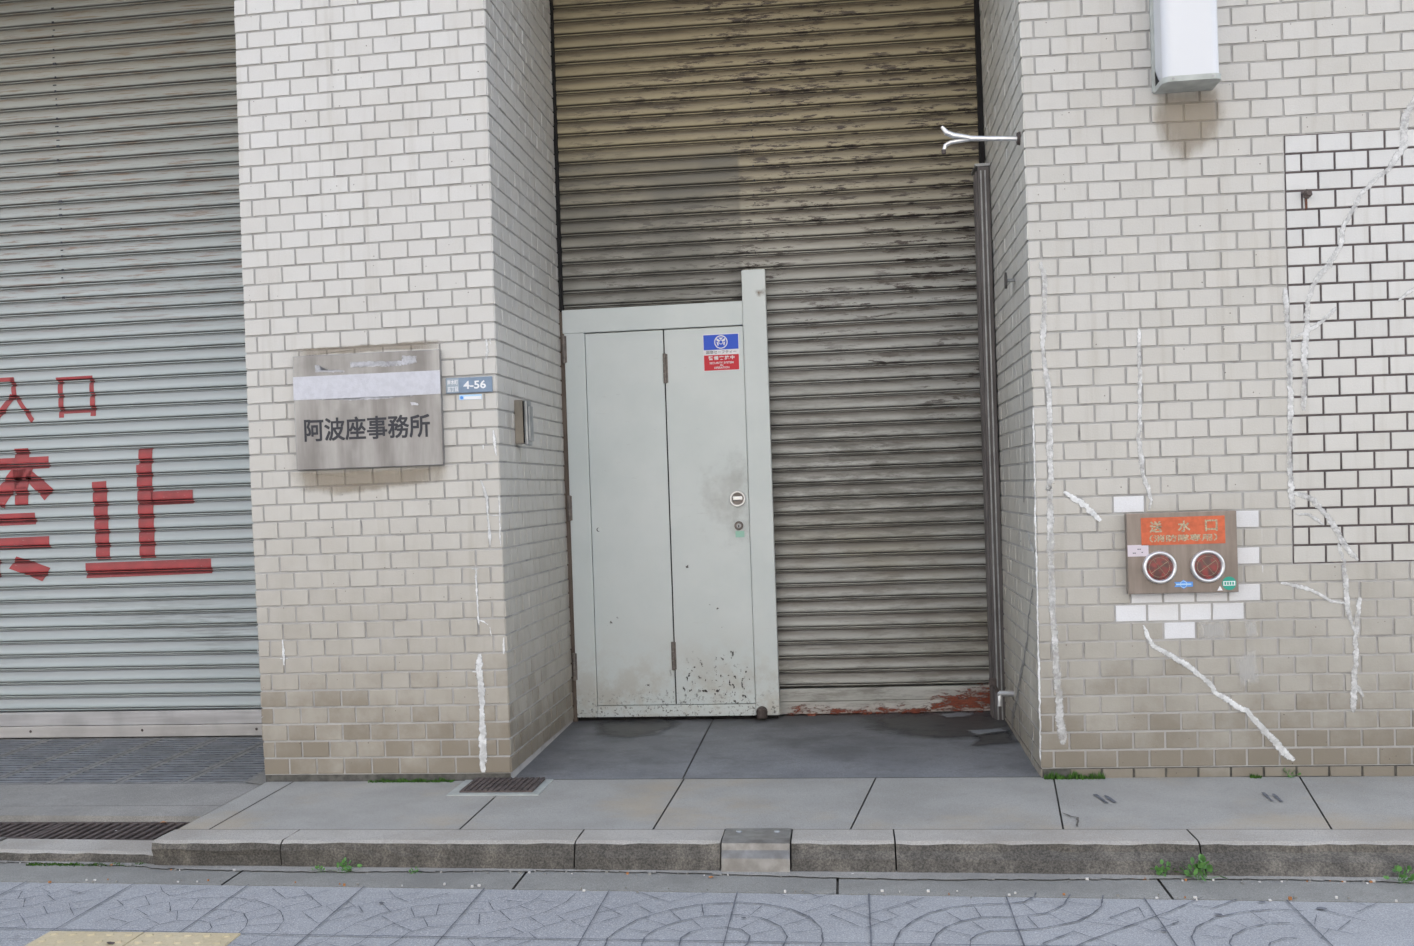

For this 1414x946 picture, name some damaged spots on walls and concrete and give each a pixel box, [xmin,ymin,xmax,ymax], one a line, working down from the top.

crack [472,430,505,772]
crack [1011,262,1102,760]
crack [1136,328,1153,510]
crack [1143,625,1295,761]
crack [1281,96,1414,713]